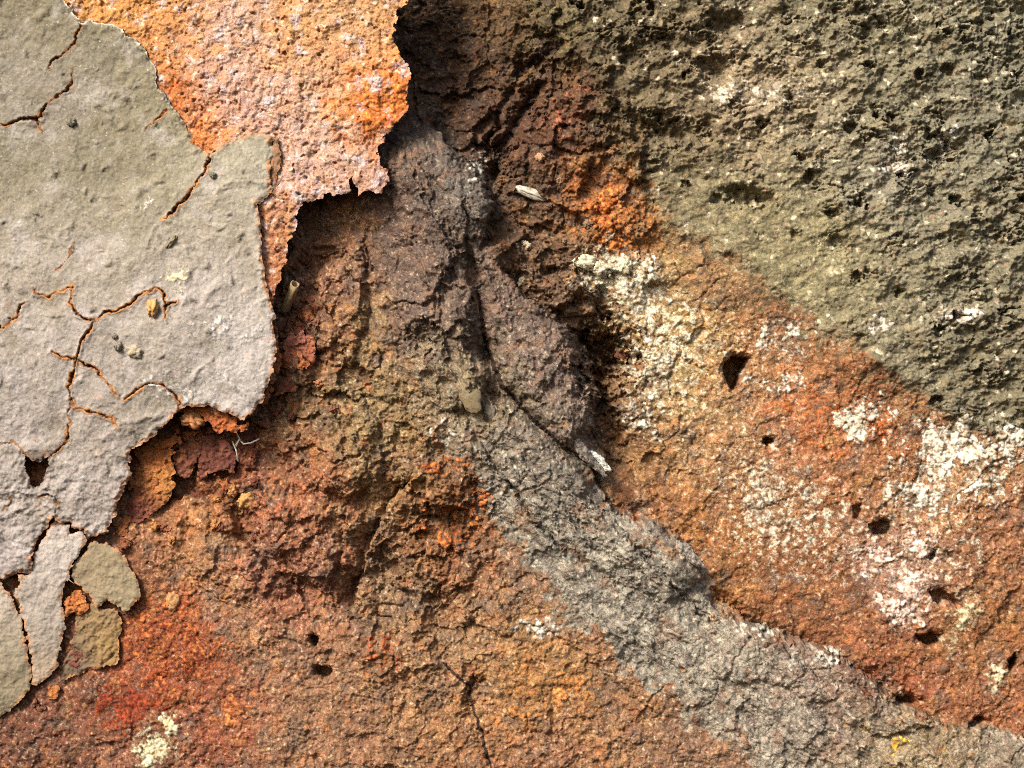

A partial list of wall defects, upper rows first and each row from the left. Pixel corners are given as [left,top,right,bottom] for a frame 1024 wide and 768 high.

crack [0,24,84,134]
crack [144,108,168,132]
crack [160,156,211,221]
crack [0,242,182,457]
peeling [0,0,493,716]
damp [577,250,694,441]
damp [742,320,817,392]
damp [920,304,984,329]
damp [833,391,1024,517]
damp [852,529,951,629]
damp [729,622,779,641]
damp [788,646,844,671]